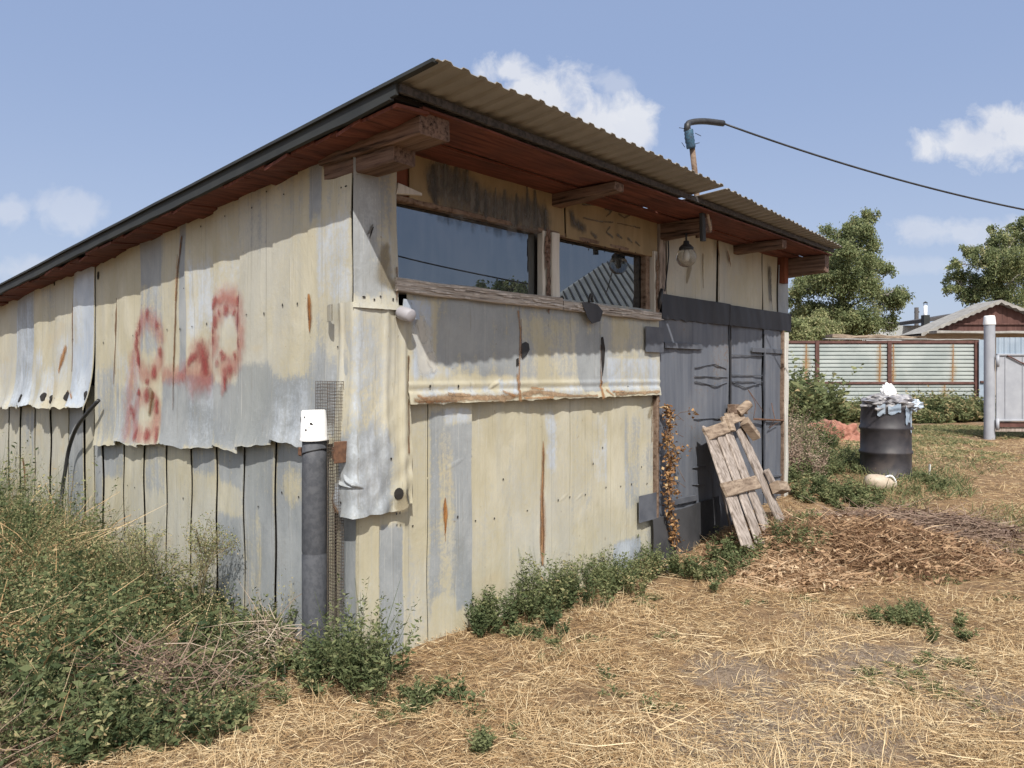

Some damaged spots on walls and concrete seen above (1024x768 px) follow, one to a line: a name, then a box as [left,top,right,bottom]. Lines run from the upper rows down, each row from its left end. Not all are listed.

water stain [427,162,549,234]
corrosion [58,305,73,373]
corrosion [408,311,660,453]